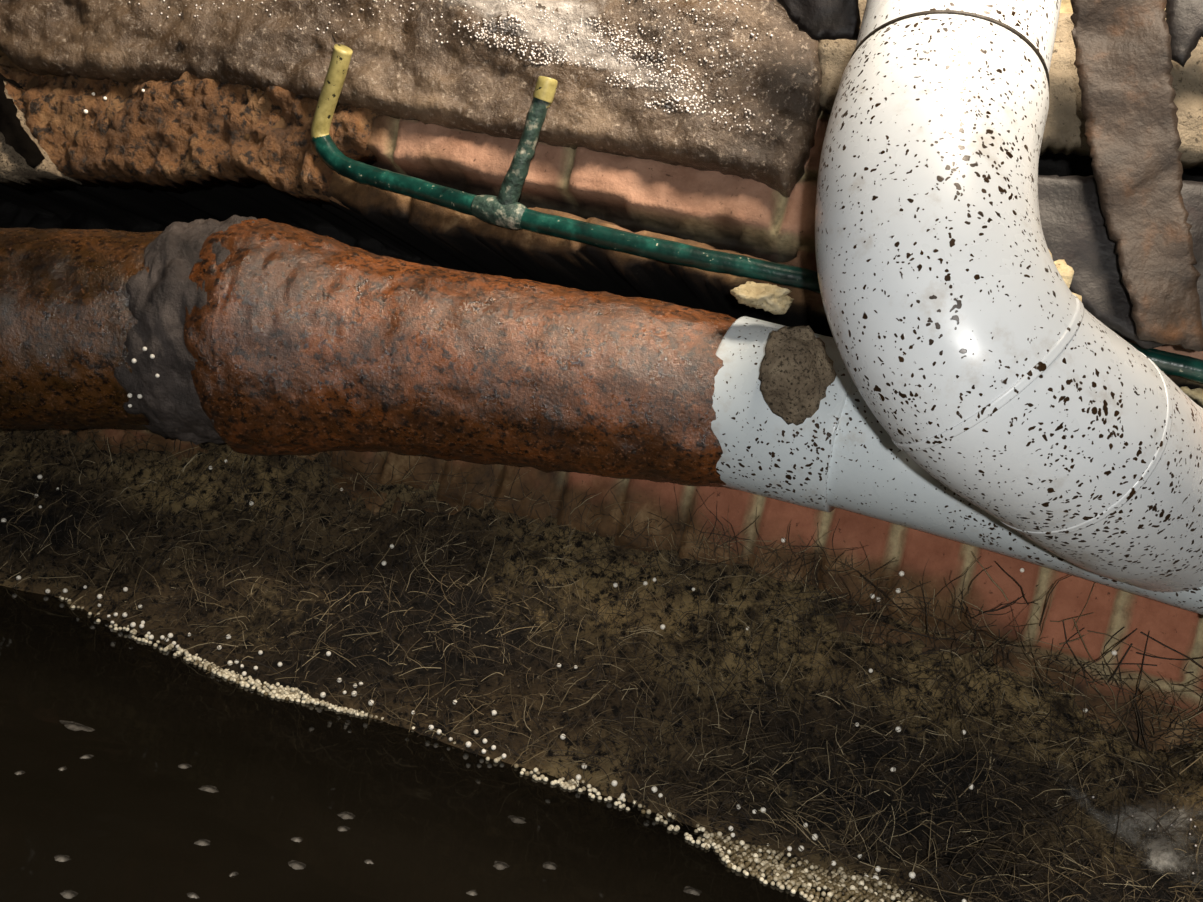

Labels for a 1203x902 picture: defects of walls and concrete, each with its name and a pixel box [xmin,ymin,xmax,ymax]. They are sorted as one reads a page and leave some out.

crack [0,73,45,169]
damp [296,0,779,135]